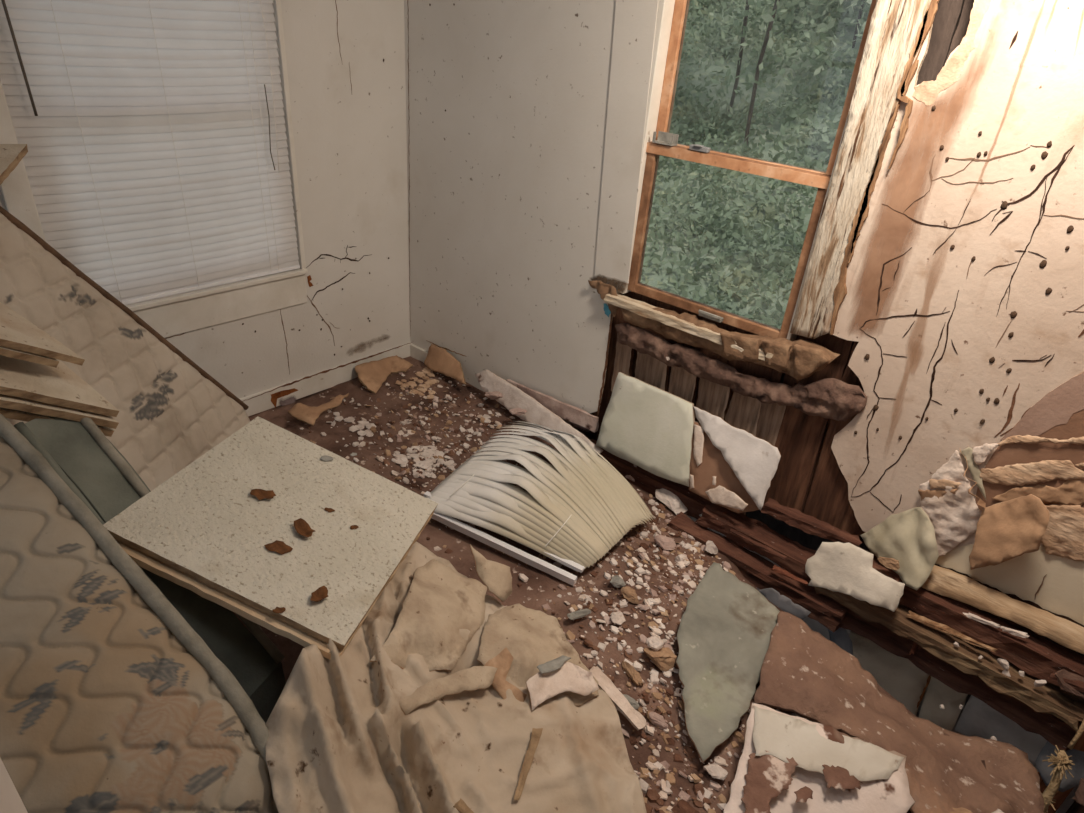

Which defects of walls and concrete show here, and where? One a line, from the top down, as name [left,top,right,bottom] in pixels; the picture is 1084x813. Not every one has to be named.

crack [335,0,352,91]
spalling [913,0,991,106]
crack [404,0,412,298]
crack [242,245,412,402]
spalling [620,307,840,381]
crack [851,145,1084,512]
peeling [975,372,1084,511]
peeling [860,507,939,590]
peeling [997,658,1047,687]
spalling [1066,801,1084,813]